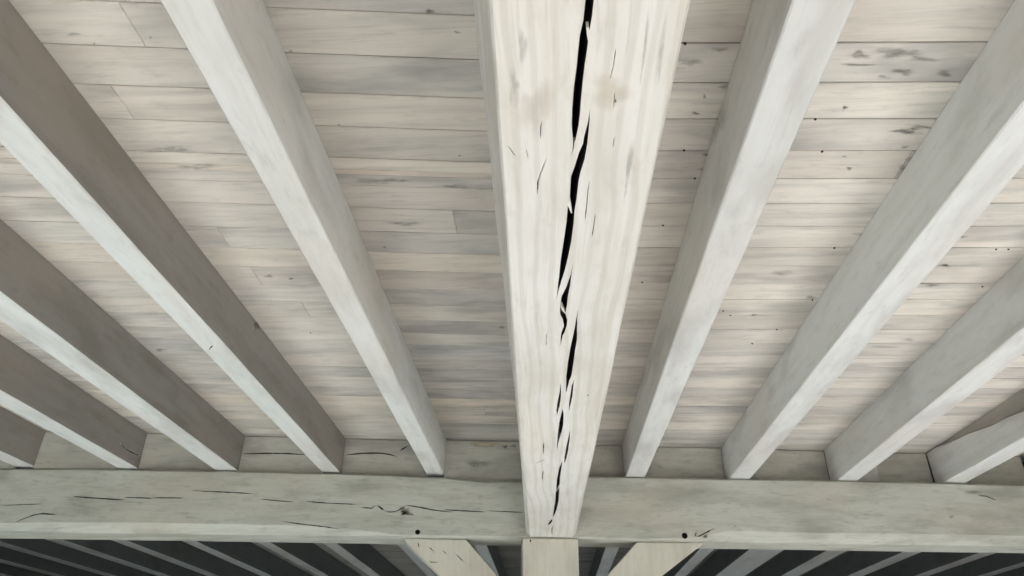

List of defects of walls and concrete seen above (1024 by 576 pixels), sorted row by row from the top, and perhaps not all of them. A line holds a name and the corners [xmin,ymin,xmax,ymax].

crack [530,0,595,542]
crack [248,450,304,458]
crack [348,446,408,457]
crack [73,494,166,502]
crack [1,504,55,522]
crack [203,491,522,529]